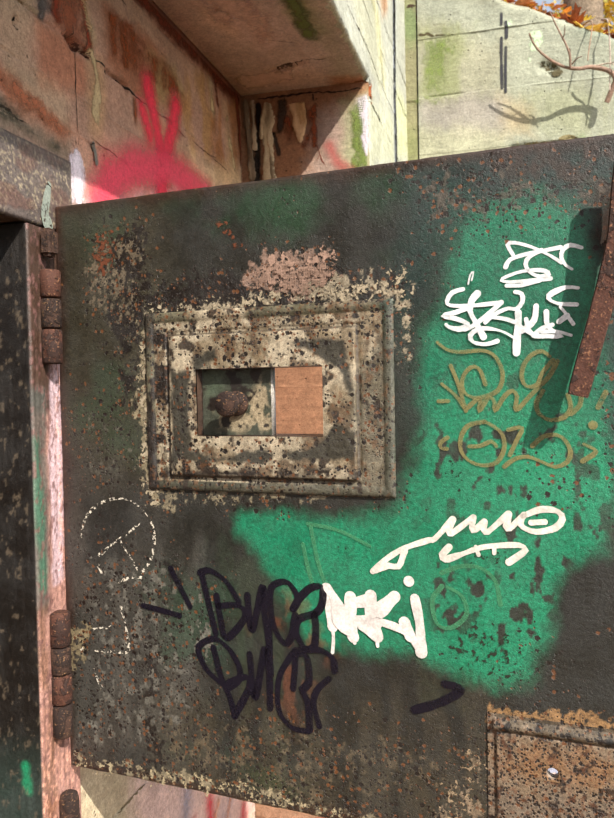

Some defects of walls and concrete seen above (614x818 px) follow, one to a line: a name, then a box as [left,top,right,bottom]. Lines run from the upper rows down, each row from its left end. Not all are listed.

crack [70,31,228,172]
peeling [144,244,416,314]
peeling [136,332,149,465]